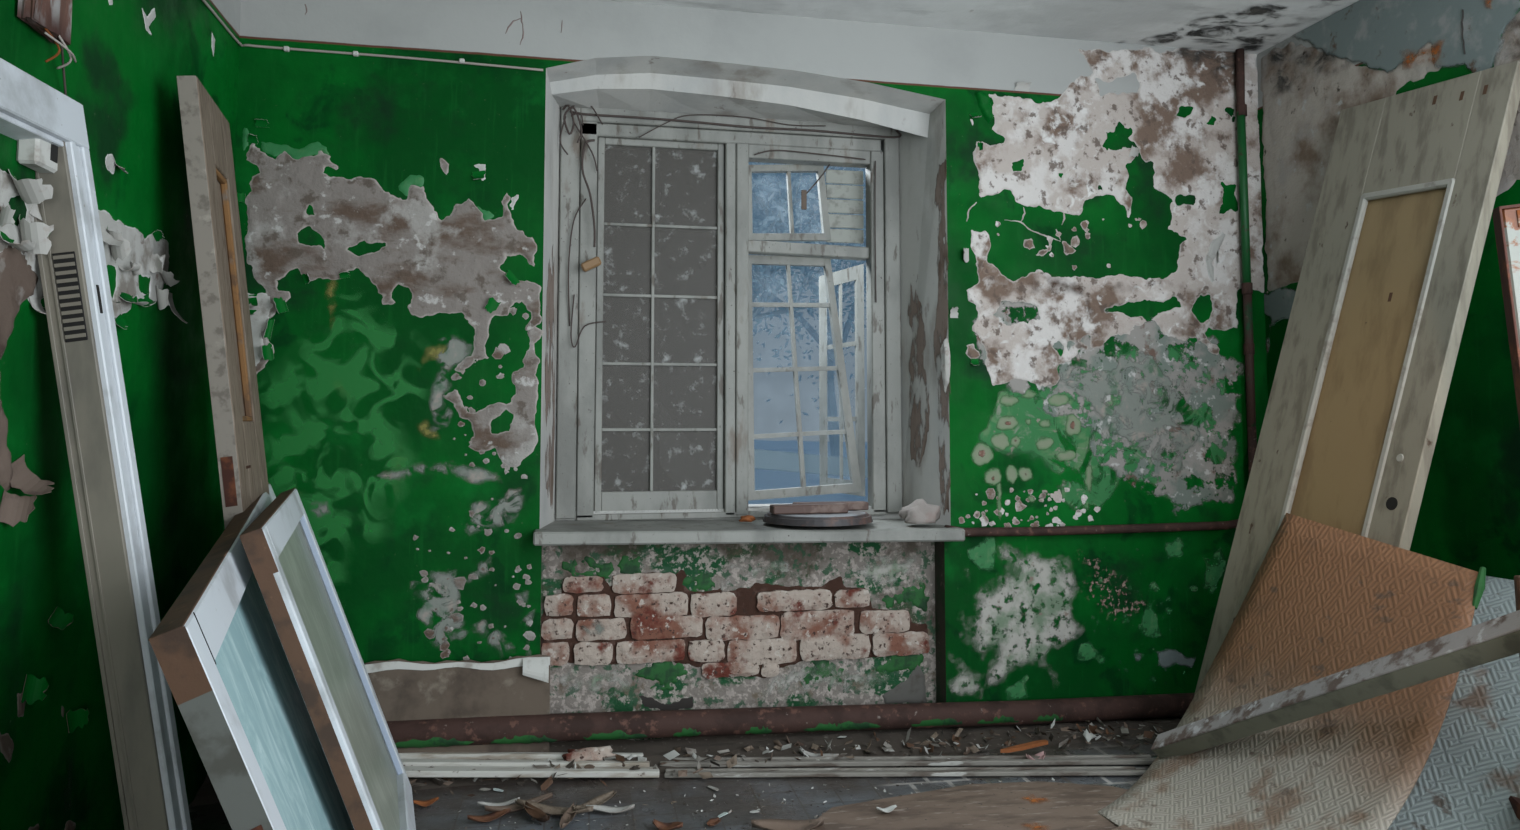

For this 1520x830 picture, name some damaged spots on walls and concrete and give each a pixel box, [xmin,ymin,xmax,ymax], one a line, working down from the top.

peeling [0,169,54,381]
peeling [98,210,188,329]
peeling [237,119,555,506]
peeling [908,0,1520,514]
peeling [0,399,54,527]
peeling [968,537,996,569]
peeling [1165,538,1183,557]
flaking render [639,695,694,710]
flaking render [540,570,930,679]
peeling [1006,675,1029,700]
peeling [1078,643,1098,661]
peeling [1136,605,1195,668]